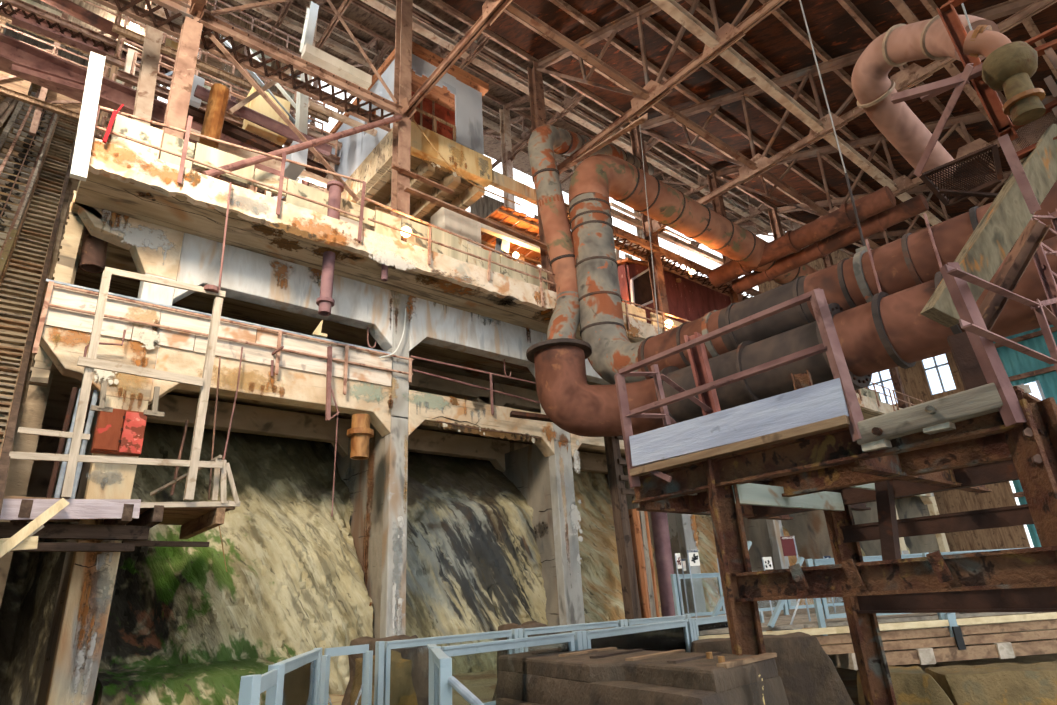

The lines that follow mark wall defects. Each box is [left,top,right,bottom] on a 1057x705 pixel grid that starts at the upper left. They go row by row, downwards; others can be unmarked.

rust [91,141,185,189]
rust [102,209,129,231]
rust [270,261,292,288]
rust [526,291,553,342]
rust [49,327,90,346]
rust [130,338,148,368]
rust [249,372,285,397]
rust [118,388,143,411]